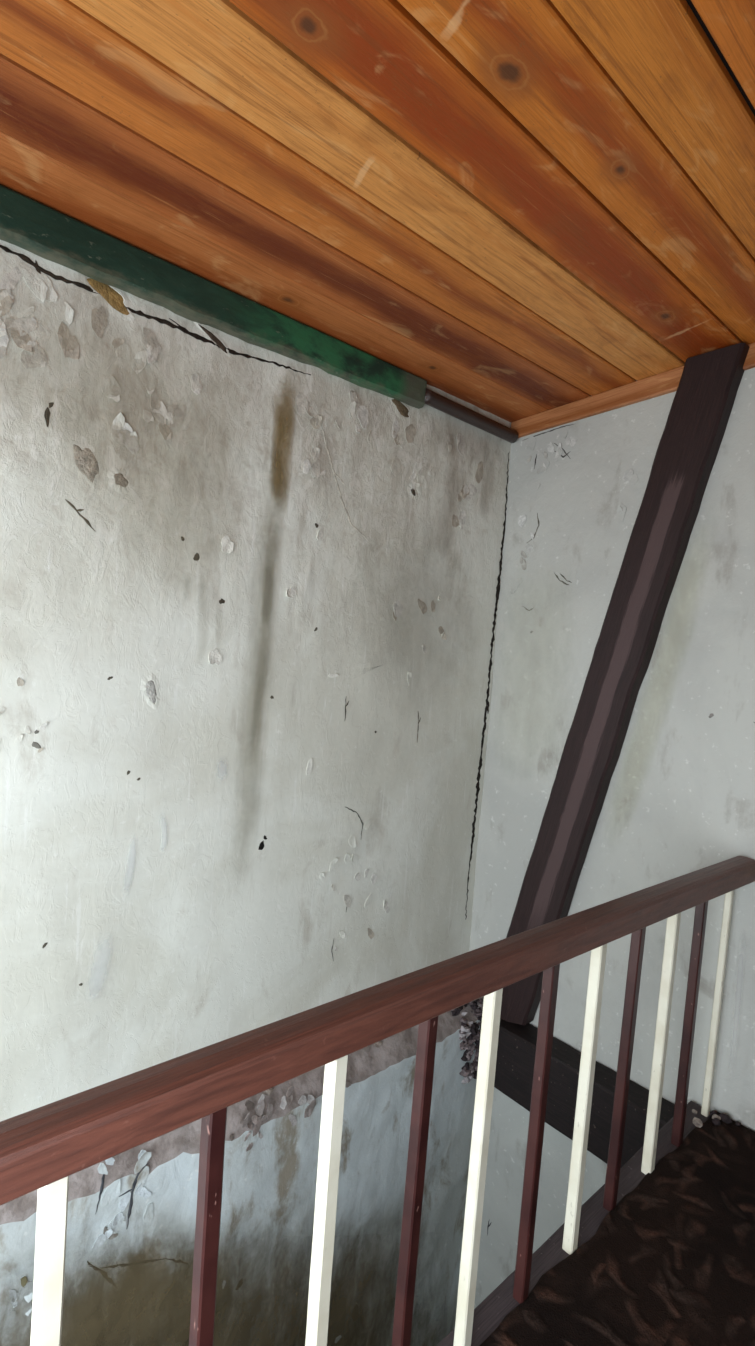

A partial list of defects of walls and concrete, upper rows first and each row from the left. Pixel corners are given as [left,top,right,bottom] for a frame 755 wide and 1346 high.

crack [0,245,311,375]
water stain [272,396,292,497]
flaking render [451,999,483,1084]
flaking render [230,1086,316,1152]
peeling [92,1150,153,1250]
water stain [61,1254,194,1346]
water stain [213,1248,311,1346]
water stain [327,1236,398,1346]